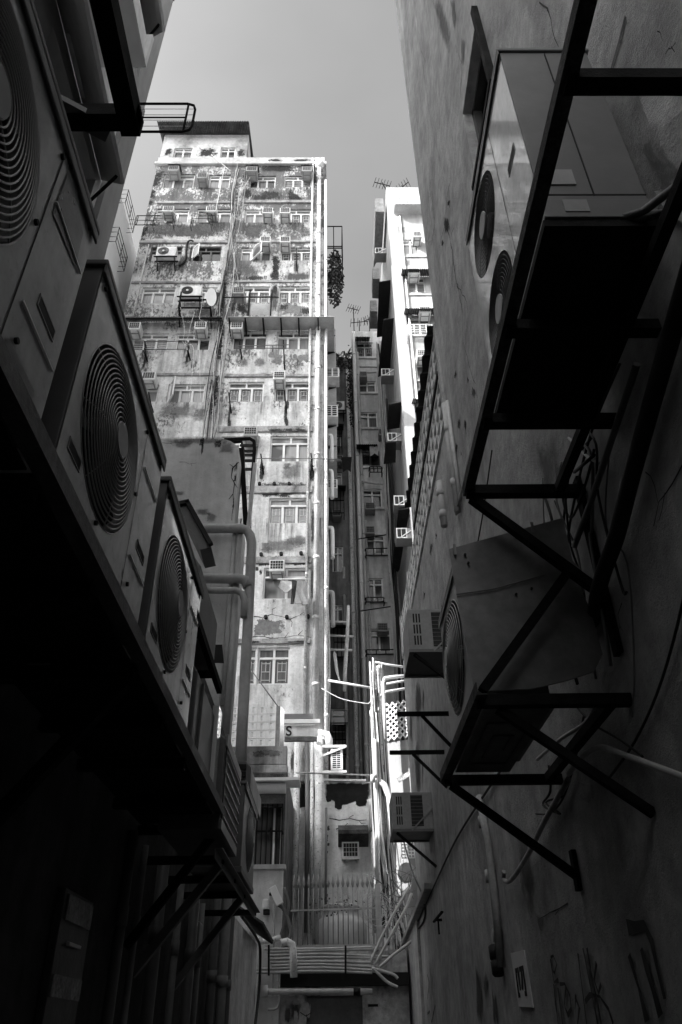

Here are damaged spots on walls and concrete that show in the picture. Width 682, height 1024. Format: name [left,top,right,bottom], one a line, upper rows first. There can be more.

leakage [242,170,302,200]
leakage [262,159,316,184]
leakage [141,210,222,240]
leakage [243,224,309,238]
leakage [270,256,309,311]
leakage [160,270,228,419]